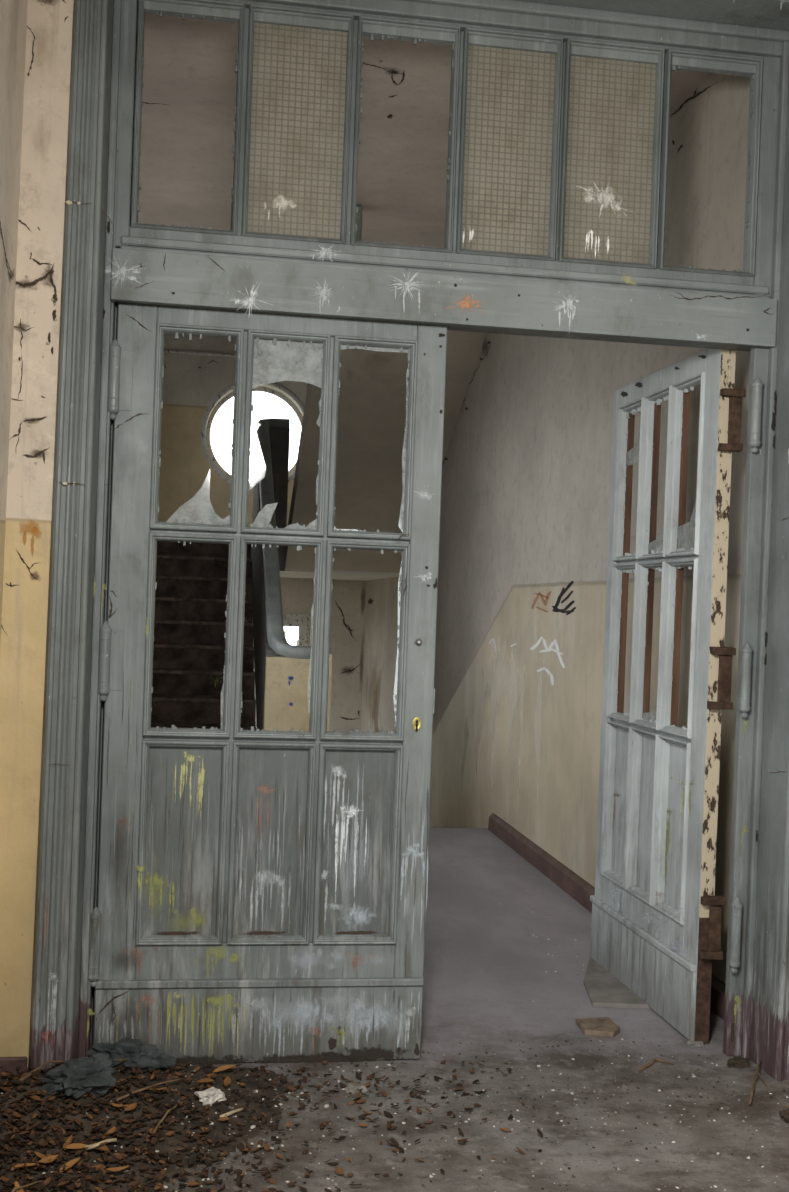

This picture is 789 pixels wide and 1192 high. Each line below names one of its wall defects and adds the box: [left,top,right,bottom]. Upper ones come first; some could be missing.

crack [363,60,405,97]
crack [670,82,717,153]
crack [0,219,58,306]
crack [11,319,107,486]
crack [335,600,360,674]